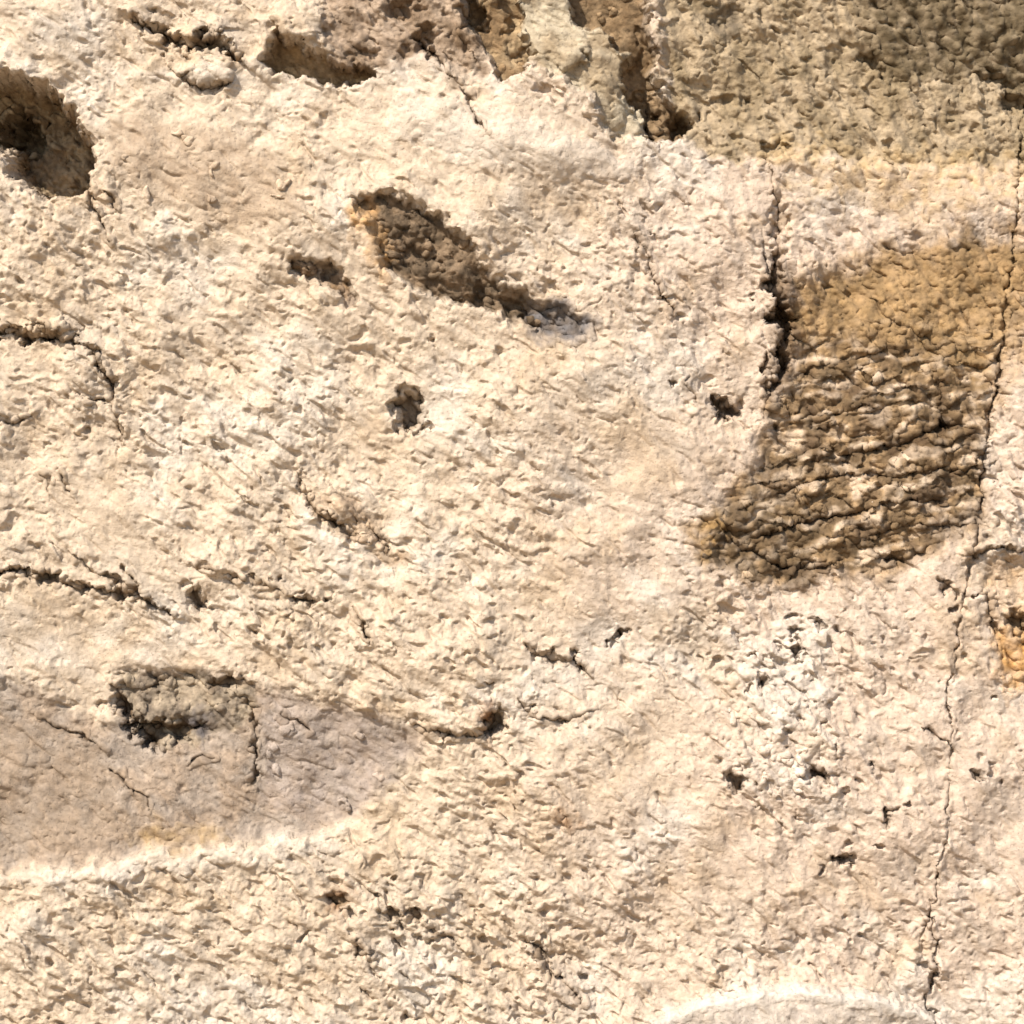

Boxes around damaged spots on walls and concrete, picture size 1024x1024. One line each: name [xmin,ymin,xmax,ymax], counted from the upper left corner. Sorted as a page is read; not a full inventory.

spalling [262,30,377,90]
spalling [568,0,696,143]
flaking render [0,74,307,243]
crack [0,313,129,443]
spalling [288,251,360,315]
spalling [353,187,541,327]
crack [751,162,796,425]
leakage [758,259,807,402]
leakage [872,379,980,478]
crack [0,549,179,621]
leakage [700,479,838,608]
crack [910,97,1024,1024]